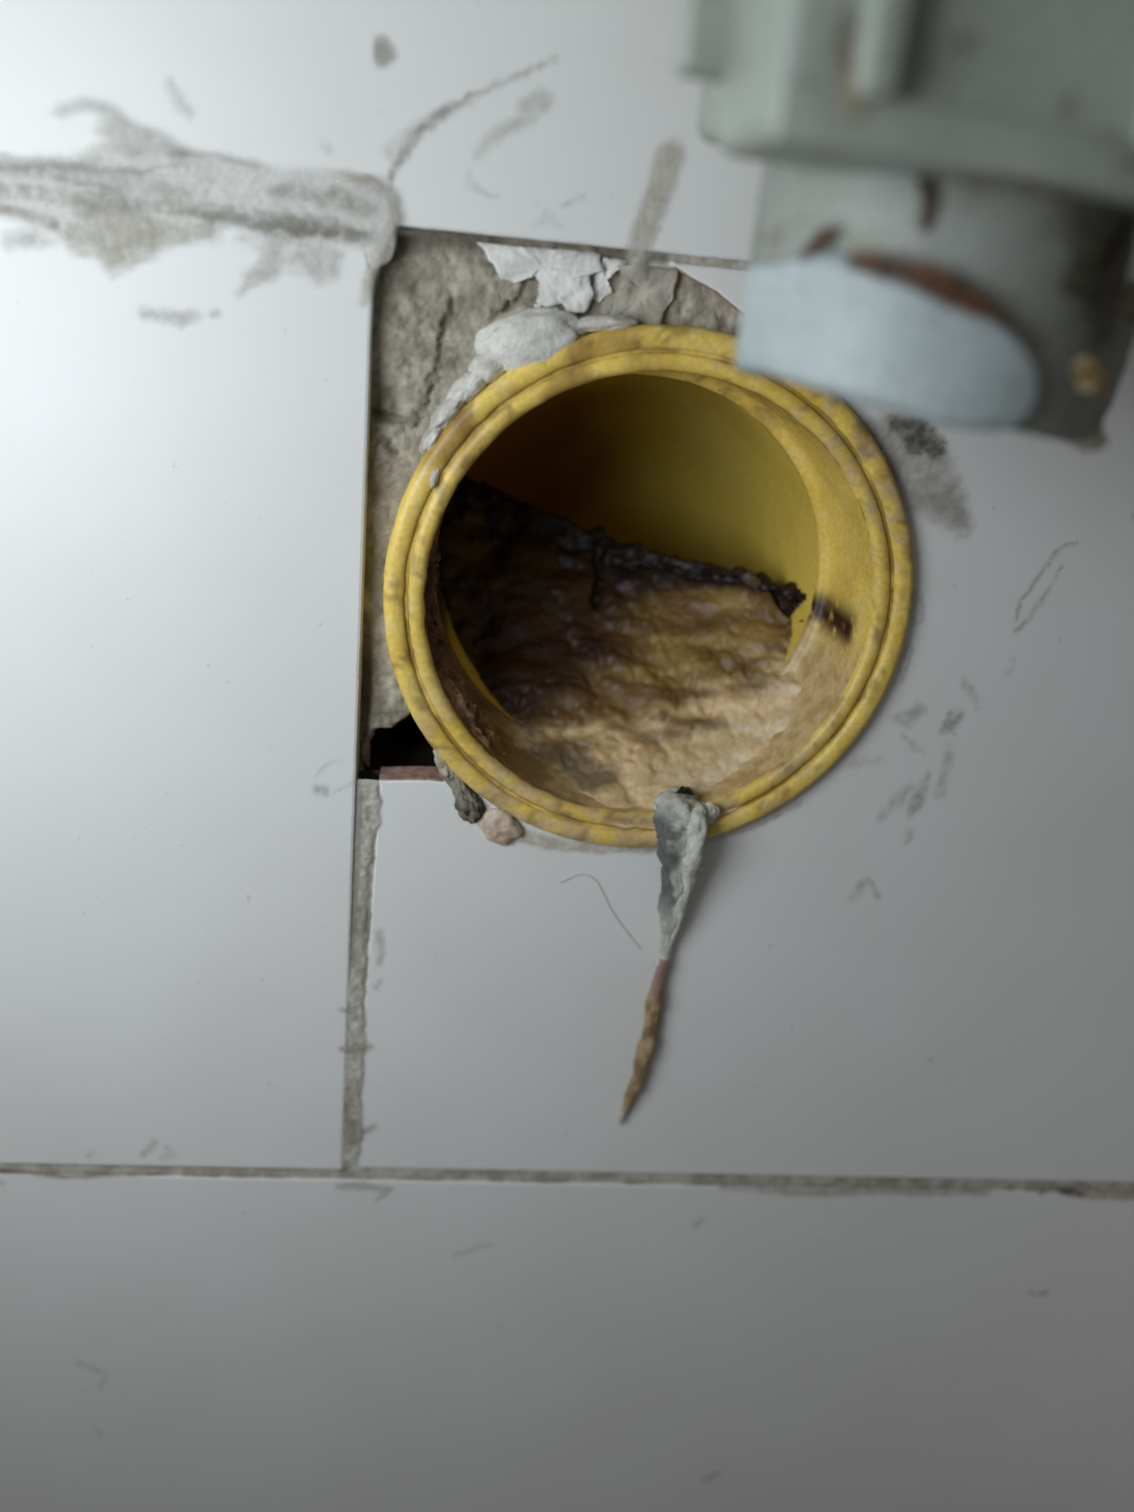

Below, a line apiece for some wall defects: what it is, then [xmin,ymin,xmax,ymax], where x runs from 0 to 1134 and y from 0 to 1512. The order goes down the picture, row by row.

spalling [359,227,741,780]